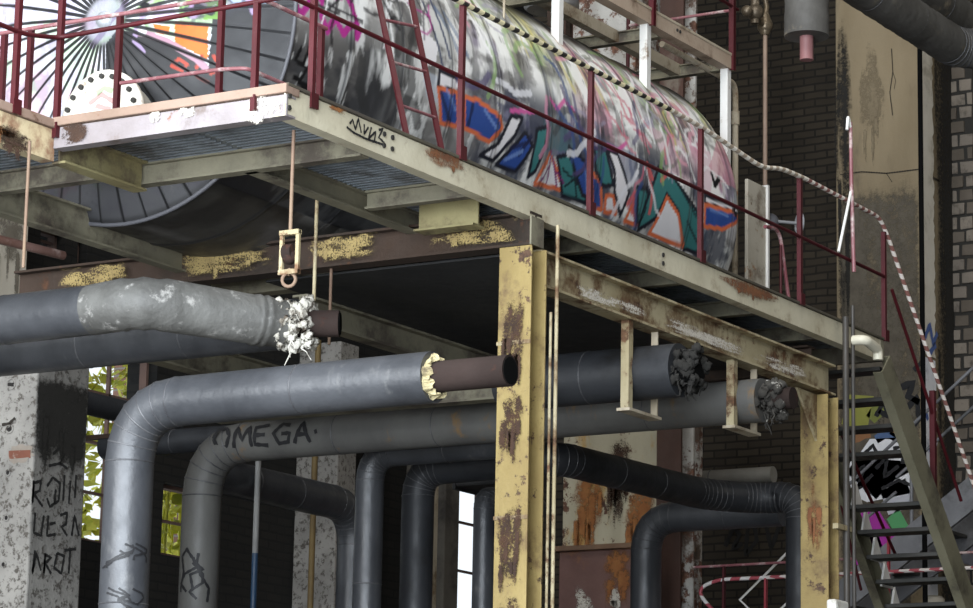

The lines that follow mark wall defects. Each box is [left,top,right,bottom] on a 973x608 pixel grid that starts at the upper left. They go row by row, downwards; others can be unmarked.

corrosion [0,125,29,161]
leakage [860,55,884,160]
corrosion [499,300,524,462]
corrosion [497,508,522,608]
peeling [575,589,592,608]
corrosion [573,481,654,604]
corrosion [807,486,822,548]